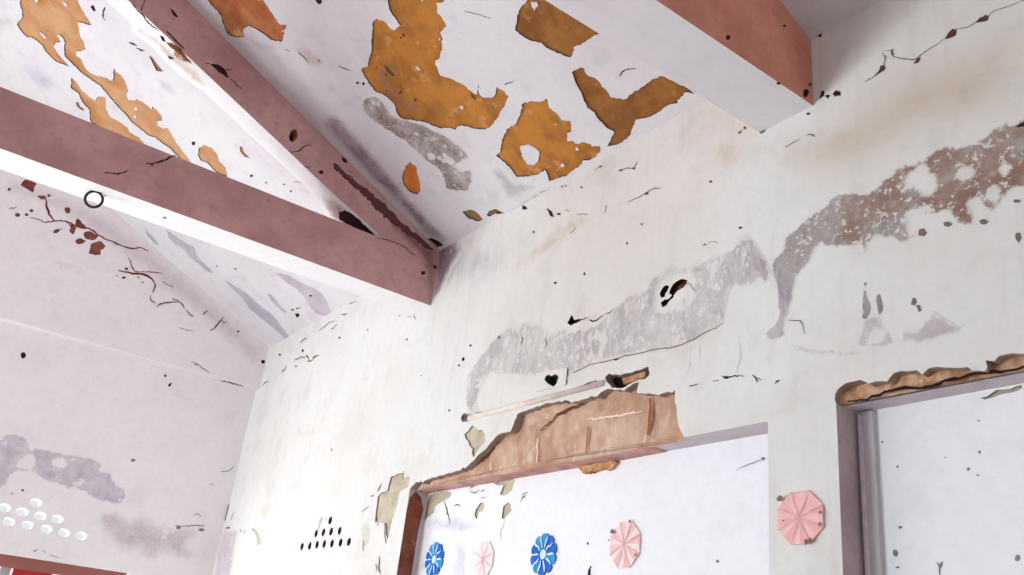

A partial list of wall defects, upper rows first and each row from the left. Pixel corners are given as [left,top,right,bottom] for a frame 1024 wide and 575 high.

peeling [18,0,227,176]
peeling [209,0,287,41]
peeling [356,0,509,194]
peeling [516,0,598,56]
peeling [497,67,692,187]
crack [866,0,1023,81]
crack [9,198,239,332]
damp [314,108,602,313]
damp [465,0,1024,414]
damp [0,433,262,575]
peeling [377,473,410,536]